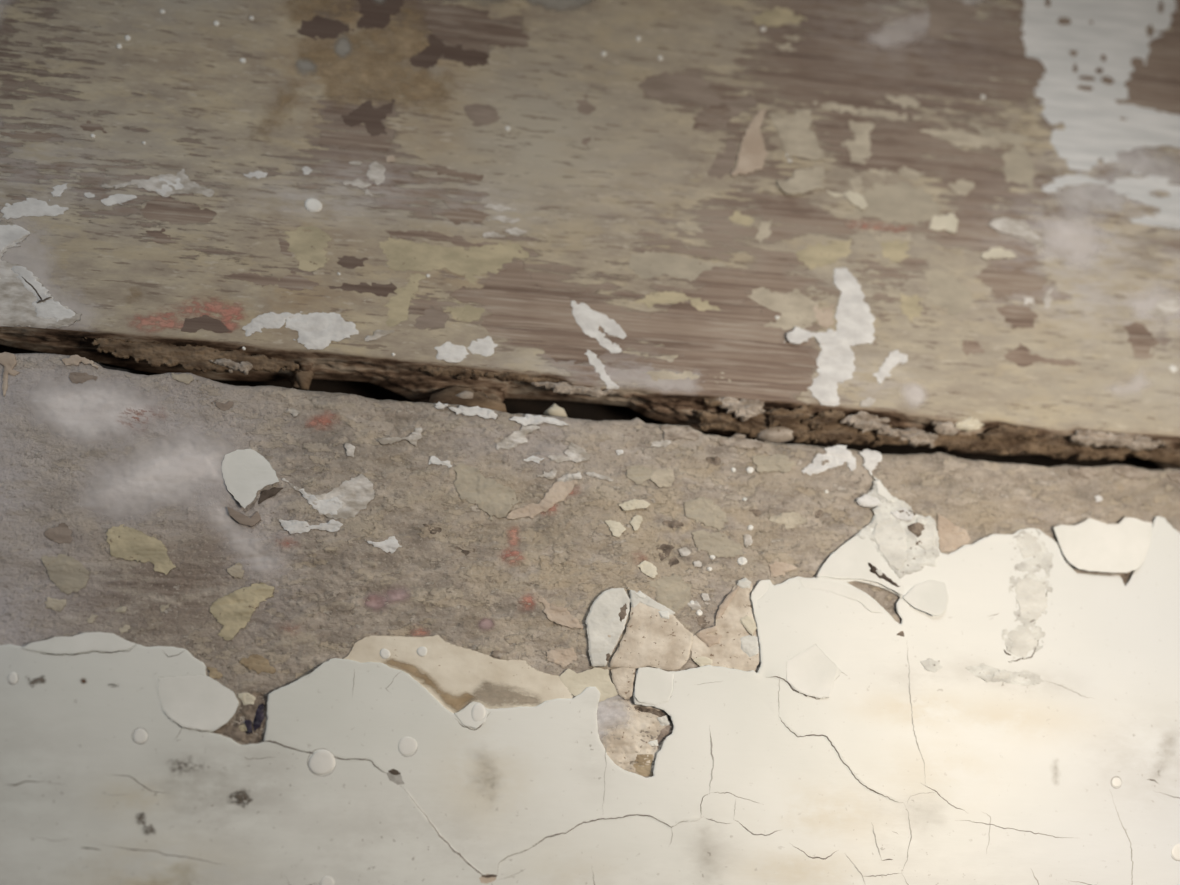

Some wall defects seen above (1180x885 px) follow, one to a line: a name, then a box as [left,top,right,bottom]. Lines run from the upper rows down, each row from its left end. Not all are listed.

peeling [297,0,404,40]
peeling [409,4,530,69]
peeling [11,266,75,322]
peeling [224,271,397,297]
peeling [450,260,606,364]
peeling [974,218,1047,330]
peeling [0,279,1180,885]
crack [41,645,136,655]
crack [1004,590,1095,699]
crack [245,646,1061,884]
crack [33,836,223,865]
crack [1110,791,1133,885]